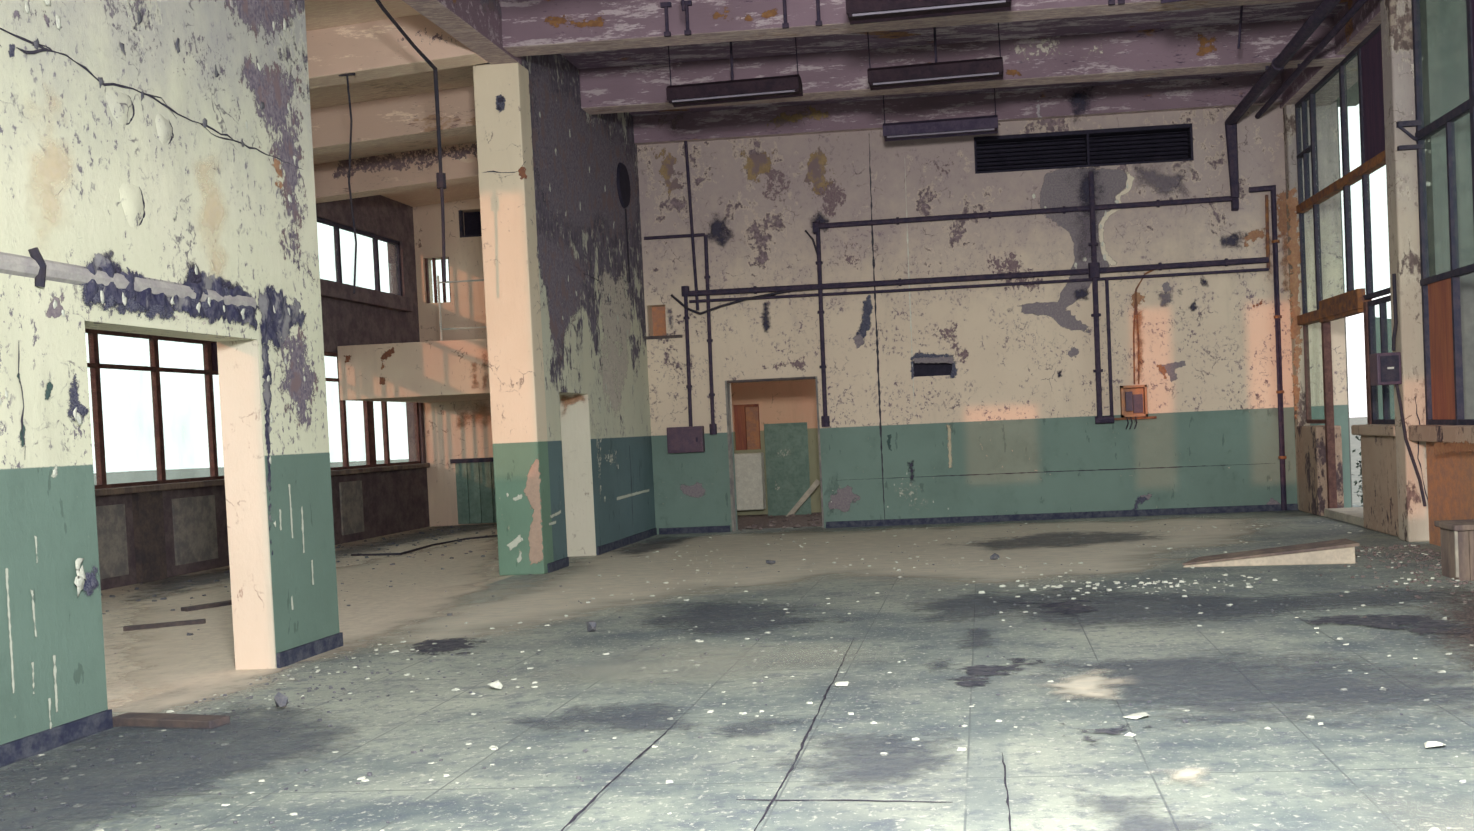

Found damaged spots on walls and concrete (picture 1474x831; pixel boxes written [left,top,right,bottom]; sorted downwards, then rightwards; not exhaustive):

spalling [8,44,48,59]
peeling [0,0,61,30]
crack [0,28,303,170]
spalling [496,94,506,112]
peeling [46,293,65,318]
peeling [79,0,319,555]
peeling [518,66,683,503]
peeling [986,167,1135,377]
peeling [1159,279,1207,311]
peeling [0,342,26,448]
spalling [45,373,89,425]
peeling [506,459,561,565]